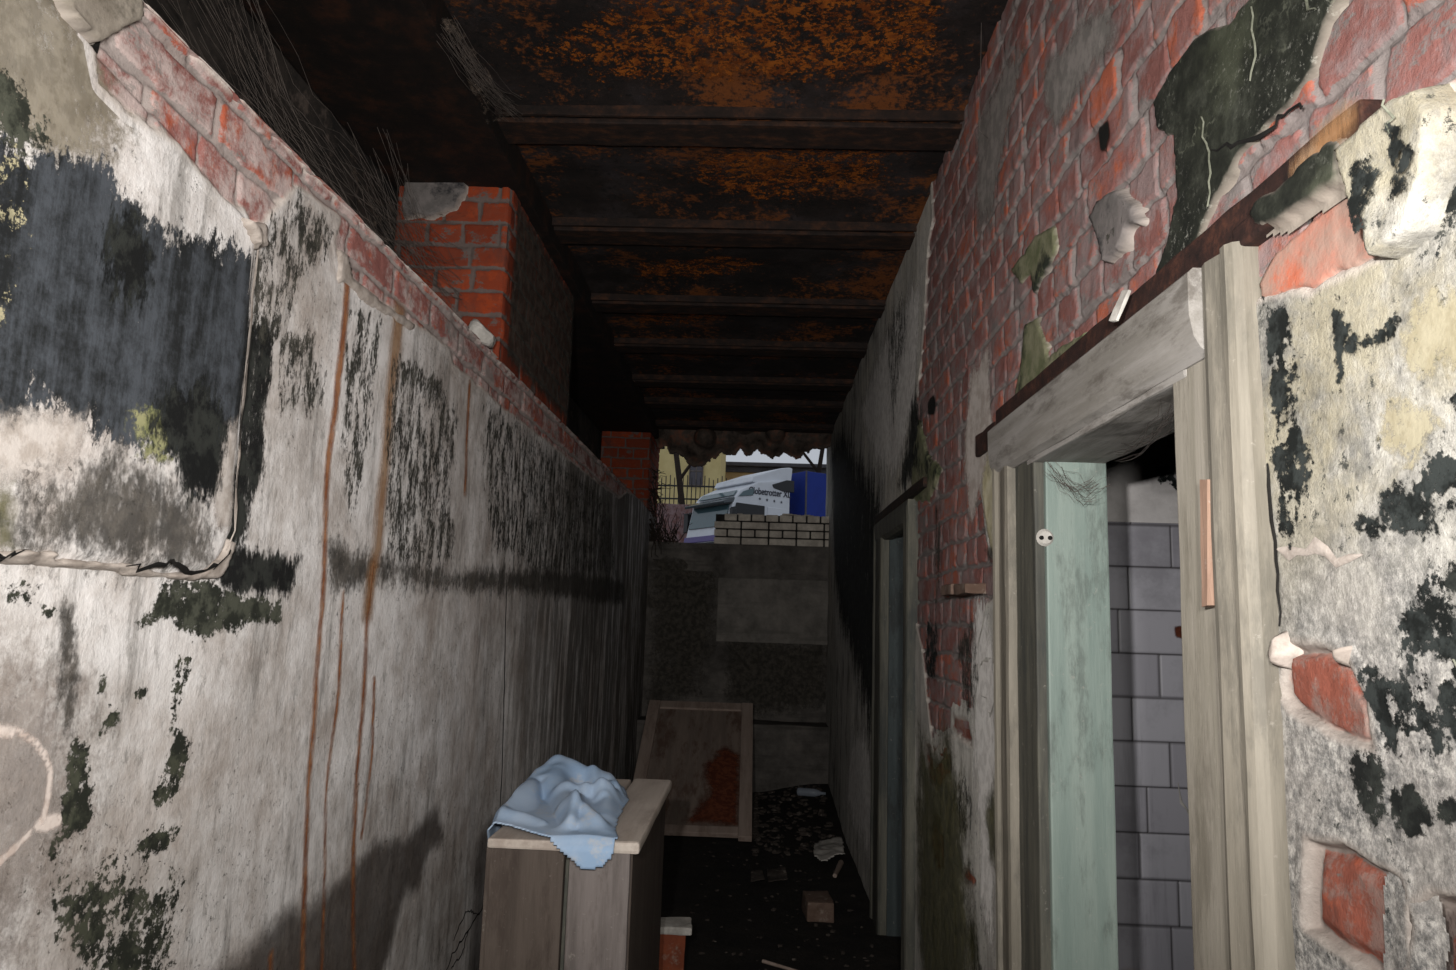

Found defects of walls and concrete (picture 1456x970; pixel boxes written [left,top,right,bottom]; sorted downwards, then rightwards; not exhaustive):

rust [528,0,957,89]
crack [1201,102,1303,207]
crack [1249,6,1257,81]
crack [1304,0,1317,12]
flaking render [1206,0,1456,321]
leakage [0,68,341,970]
rust [300,283,349,970]
rust [351,305,404,970]
flaking render [915,0,1249,787]
flaking render [1268,626,1388,771]
leakage [1329,285,1456,544]
leakage [1348,560,1456,838]